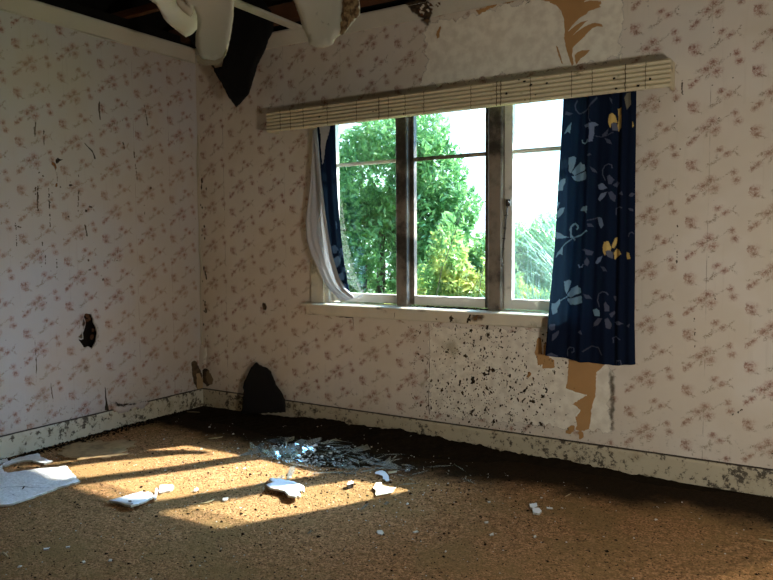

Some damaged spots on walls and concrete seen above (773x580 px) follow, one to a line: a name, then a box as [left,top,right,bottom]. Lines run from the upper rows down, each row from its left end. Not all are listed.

peeling [406,0,442,26]
leakage [408,314,568,433]